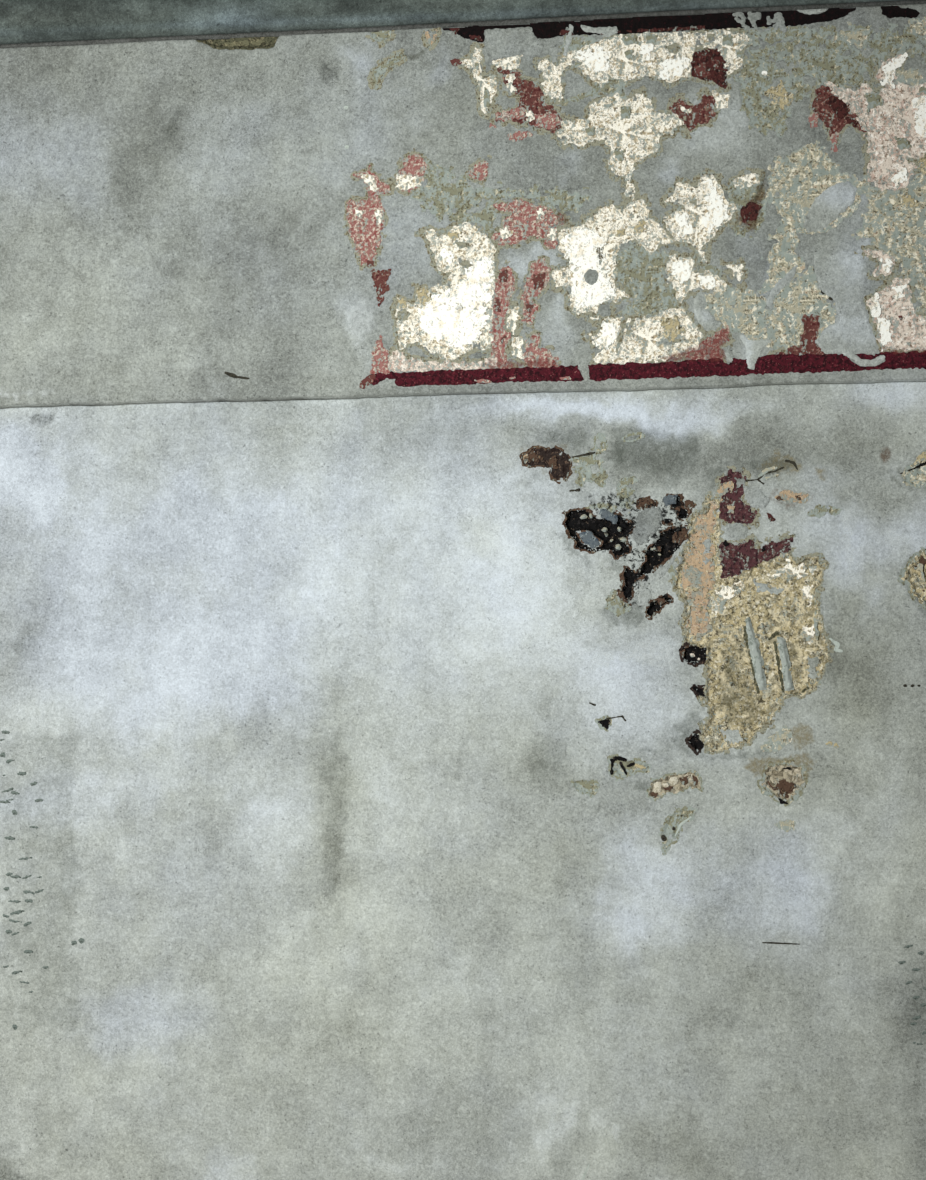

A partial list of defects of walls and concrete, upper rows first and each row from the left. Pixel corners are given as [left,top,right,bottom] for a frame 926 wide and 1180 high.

peeling [365,30,408,90]
peeling [450,11,787,381]
peeling [803,48,926,233]
peeling [370,222,525,374]
peeling [814,245,926,366]
flaking render [562,432,843,832]
flaking render [897,547,926,610]
flaking render [570,754,704,856]